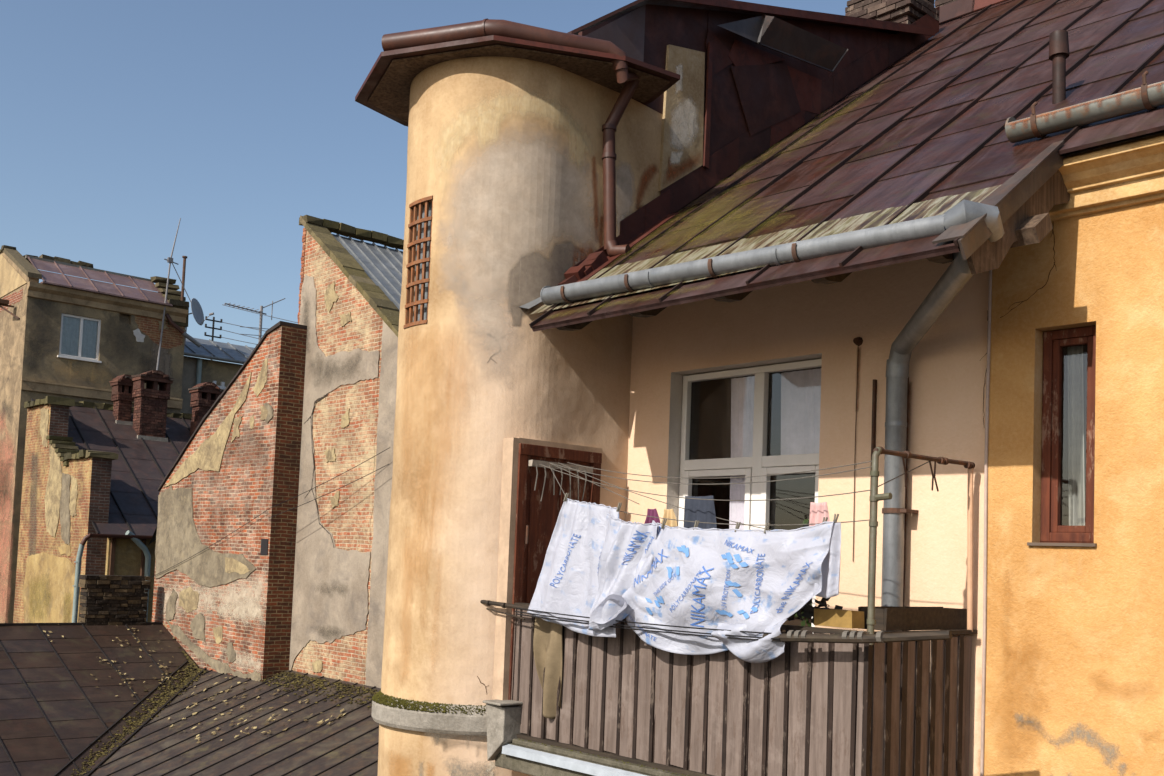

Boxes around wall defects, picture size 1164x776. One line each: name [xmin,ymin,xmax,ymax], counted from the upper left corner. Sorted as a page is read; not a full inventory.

corrosion [1012,82,1164,124]
corrosion [637,158,699,209]
damp [438,93,592,367]
crack [987,229,1057,321]
flaking render [133,315,185,349]
flaking render [313,378,378,553]
peeling [23,408,80,623]
peeling [155,358,274,682]
flaking render [292,628,368,685]
peeling [1056,726,1125,770]